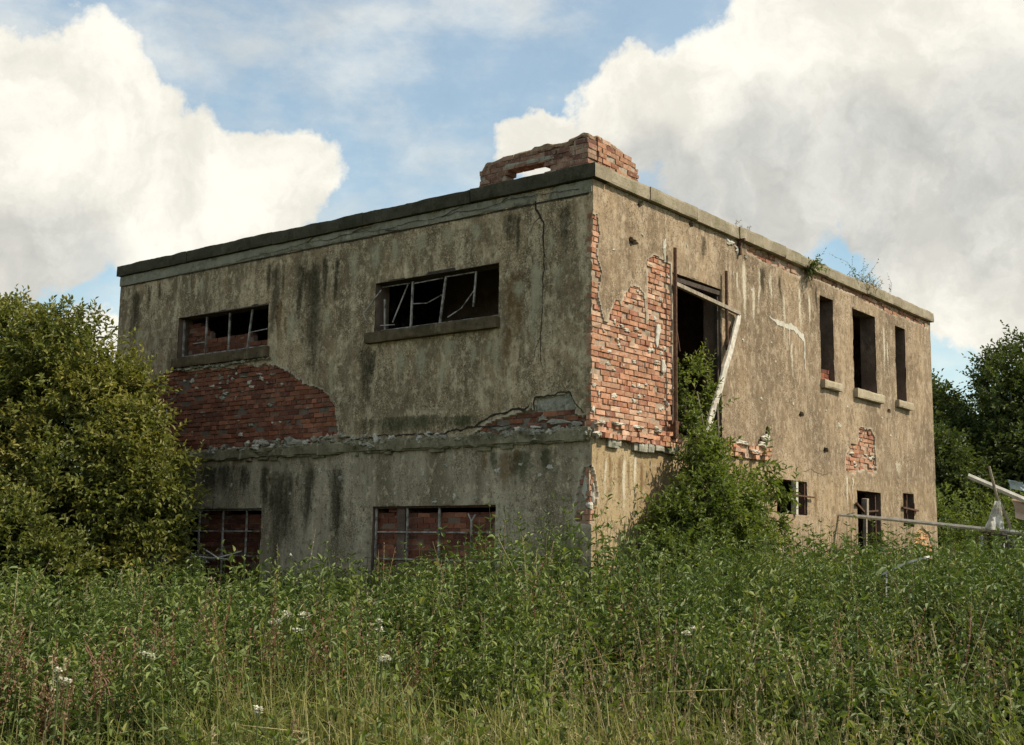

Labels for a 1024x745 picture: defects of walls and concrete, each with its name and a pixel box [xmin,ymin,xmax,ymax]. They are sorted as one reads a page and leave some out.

damp [288,259,338,343]
crack [239,189,578,365]
flaking render [478,208,672,437]
flaking render [136,357,338,453]
flaking render [846,427,875,474]
damp [332,471,341,527]
spalling [575,463,595,524]